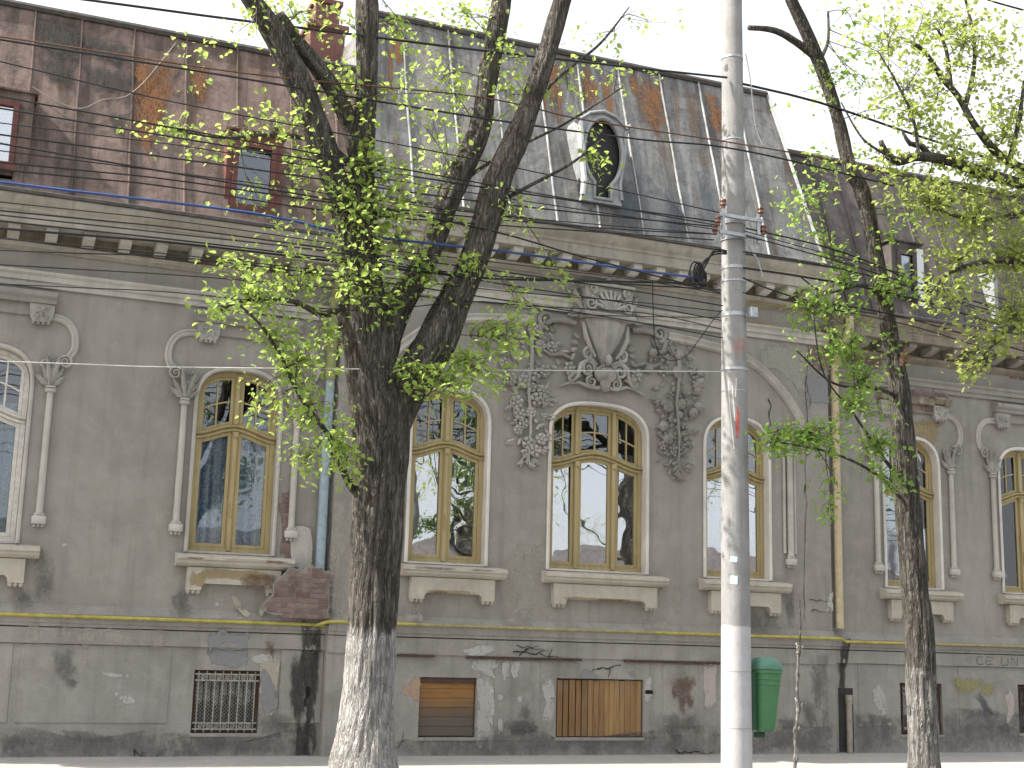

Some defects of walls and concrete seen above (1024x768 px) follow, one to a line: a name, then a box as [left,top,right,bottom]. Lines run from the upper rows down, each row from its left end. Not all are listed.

corrosion [134,54,177,154]
corrosion [543,65,563,125]
corrosion [629,77,722,137]
leakage [184,619,321,756]
peeling [251,650,281,715]
peeling [463,645,520,752]
crack [513,645,558,658]
spalling [541,680,555,725]